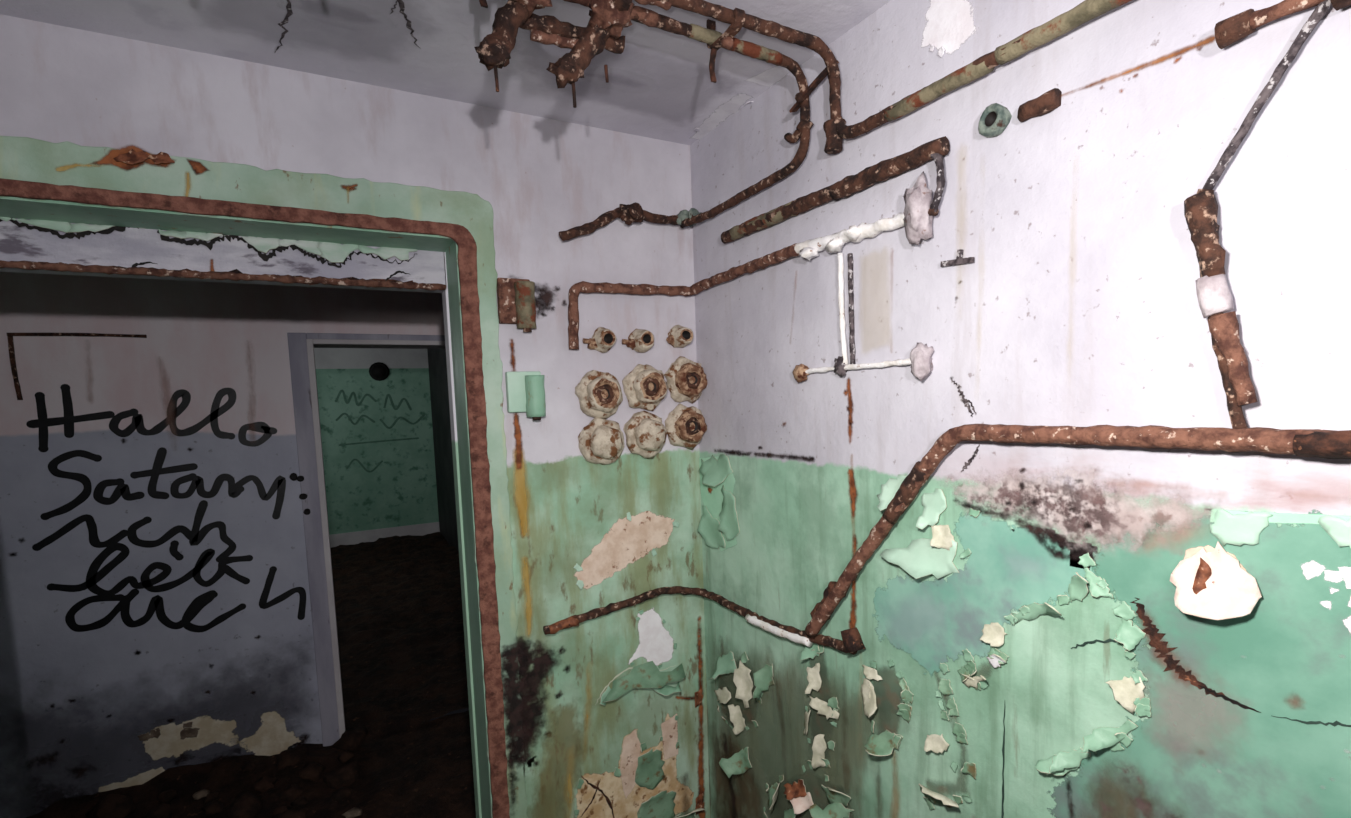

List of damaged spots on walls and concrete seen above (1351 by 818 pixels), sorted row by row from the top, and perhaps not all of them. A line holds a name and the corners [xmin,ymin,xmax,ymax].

crack [275,0,293,52]
crack [390,0,421,49]
rust [56,145,208,197]
crack [118,259,242,280]
crack [296,271,413,285]
peeling [573,511,680,590]
mould [951,468,1209,559]
peeling [861,488,1351,818]
crack [1130,598,1261,713]
spalling [98,711,301,792]
peeling [708,651,774,778]
peeling [763,643,854,818]